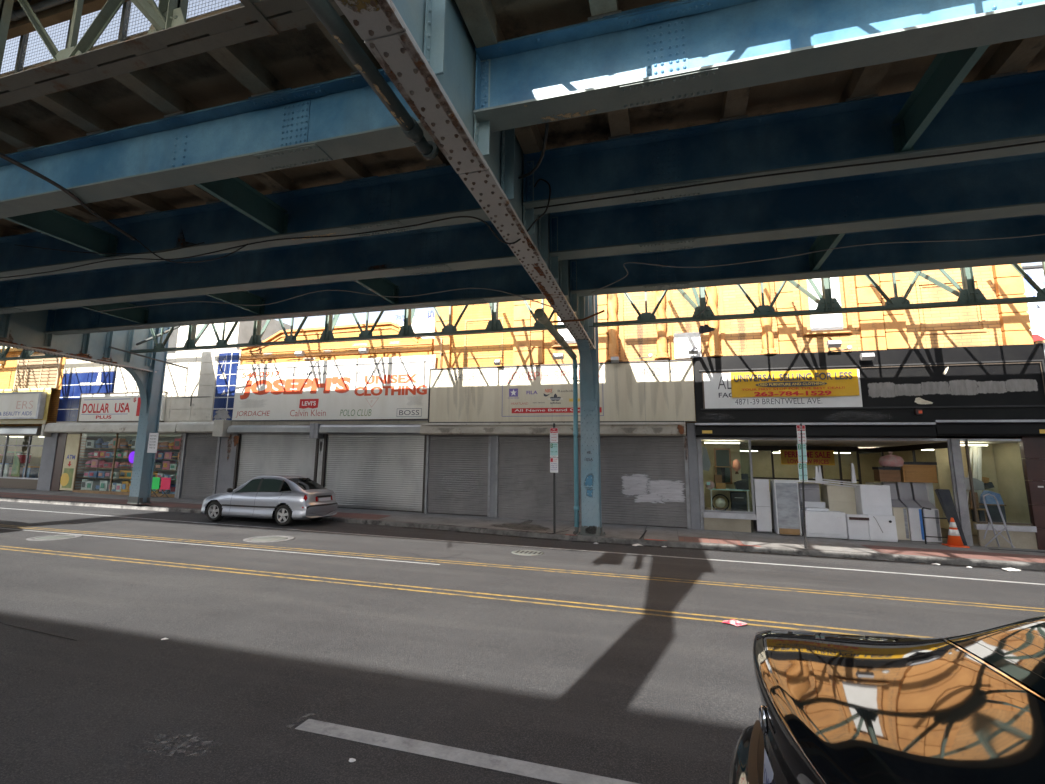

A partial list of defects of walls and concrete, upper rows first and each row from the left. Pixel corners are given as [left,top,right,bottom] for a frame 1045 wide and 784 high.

rust [340,0,402,28]
rust [404,42,485,168]
rust [508,210,555,306]